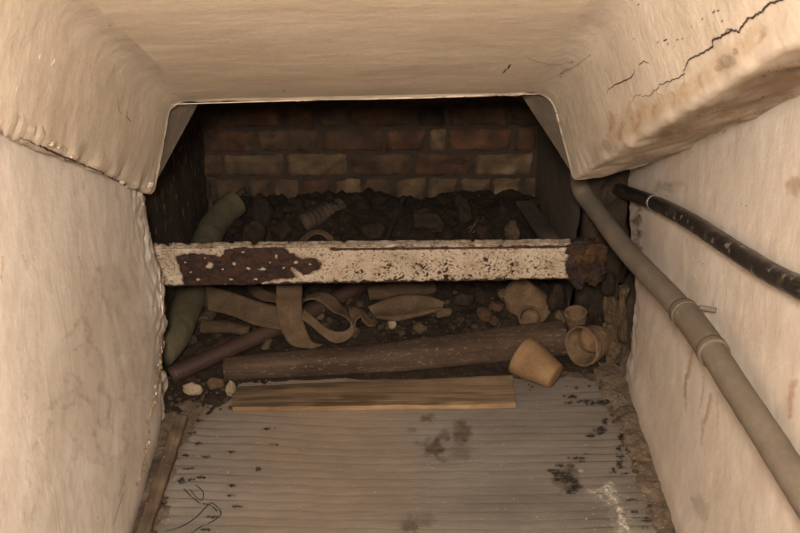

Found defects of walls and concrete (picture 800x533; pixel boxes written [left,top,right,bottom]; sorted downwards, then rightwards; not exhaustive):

crack [607,0,783,113]
corrosion [177,248,320,286]